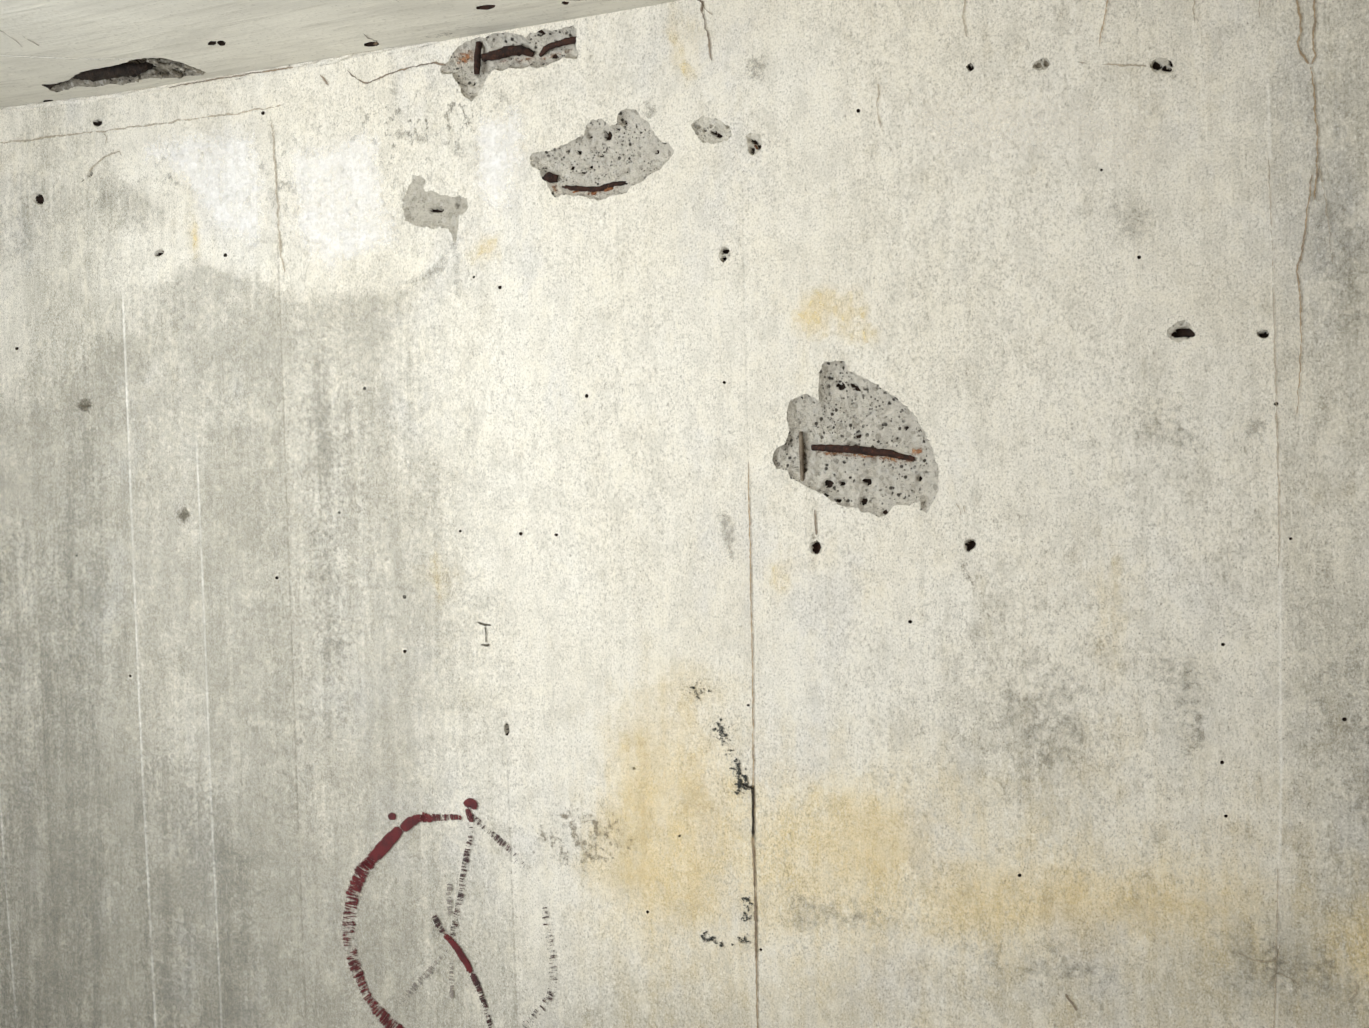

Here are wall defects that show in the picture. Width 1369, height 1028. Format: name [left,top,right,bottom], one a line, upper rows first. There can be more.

crack [1099,0,1108,46]
spalling [0,25,578,112]
spalling [530,108,674,201]
crack [1296,0,1318,413]
spalling [772,360,939,518]
damp [710,716,750,795]
crack [740,462,758,1028]
damp [533,814,610,862]
damp [701,897,753,947]